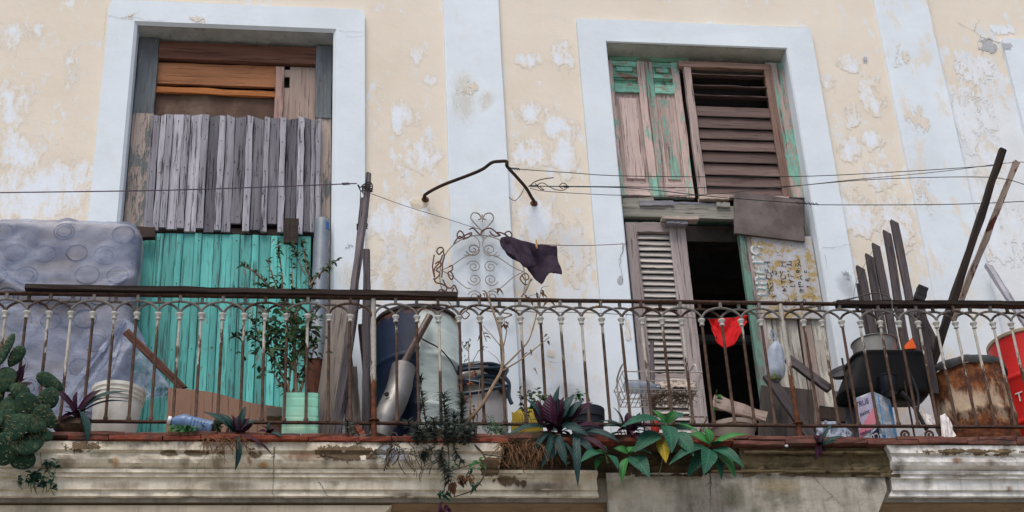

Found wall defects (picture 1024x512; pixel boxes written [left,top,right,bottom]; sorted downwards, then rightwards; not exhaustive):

peeling [514,39,575,72]
peeling [0,77,93,224]
peeling [388,94,445,177]
peeling [508,100,593,289]
peeling [832,52,933,266]
peeling [949,23,1024,268]
spalling [314,445,408,466]
spalling [479,457,527,488]